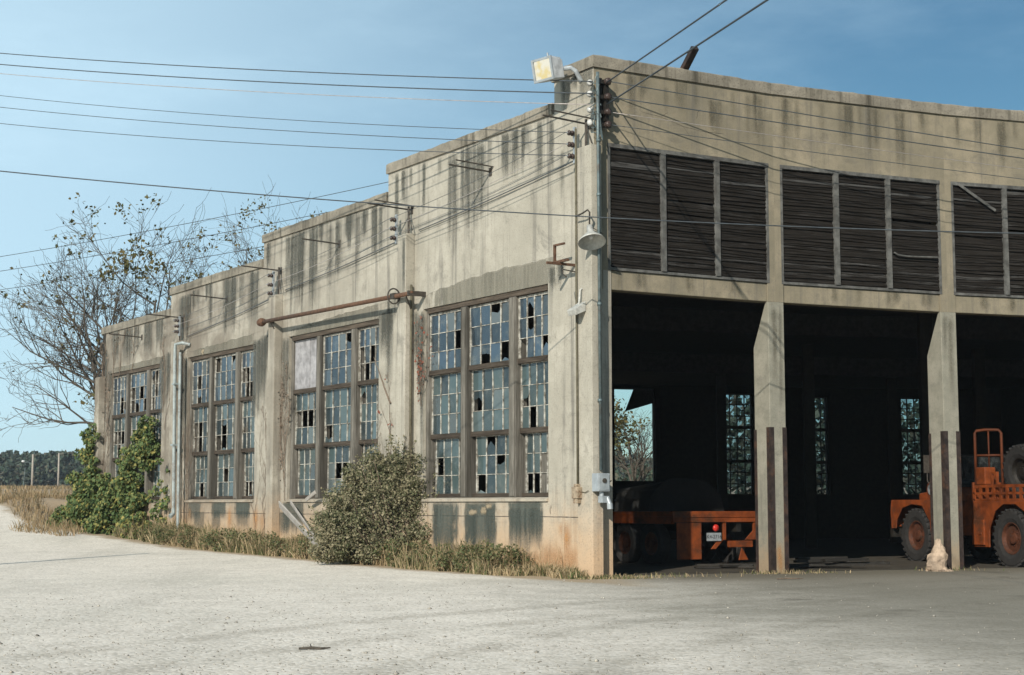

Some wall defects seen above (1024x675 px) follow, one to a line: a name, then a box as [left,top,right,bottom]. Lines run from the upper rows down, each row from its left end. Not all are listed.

leakage [502,131,517,167]
leakage [537,123,554,167]
leakage [336,208,382,249]
leakage [290,226,323,300]
leakage [433,503,496,550]
leakage [508,502,543,544]